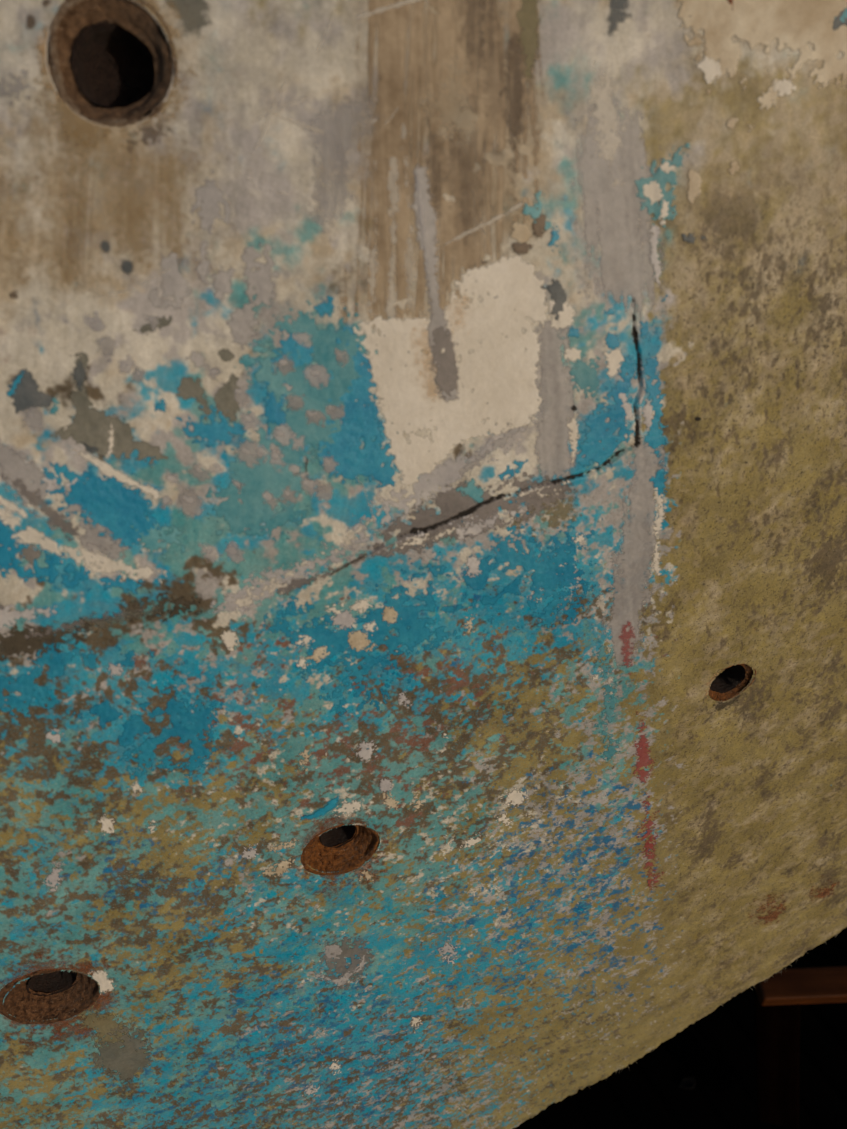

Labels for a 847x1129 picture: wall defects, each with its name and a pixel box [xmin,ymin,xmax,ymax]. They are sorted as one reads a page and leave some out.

peeling [608,0,631,35]
peeling [676,0,847,110]
peeling [133,316,172,333]
peeling [7,352,188,559]
peeling [155,75,703,717]
crack [333,299,645,574]
peeling [0,520,144,594]
peeling [0,602,158,725]
peeling [72,661,238,780]
corrosion [706,663,756,710]
corrosion [300,823,380,876]
corrosion [0,952,116,1043]